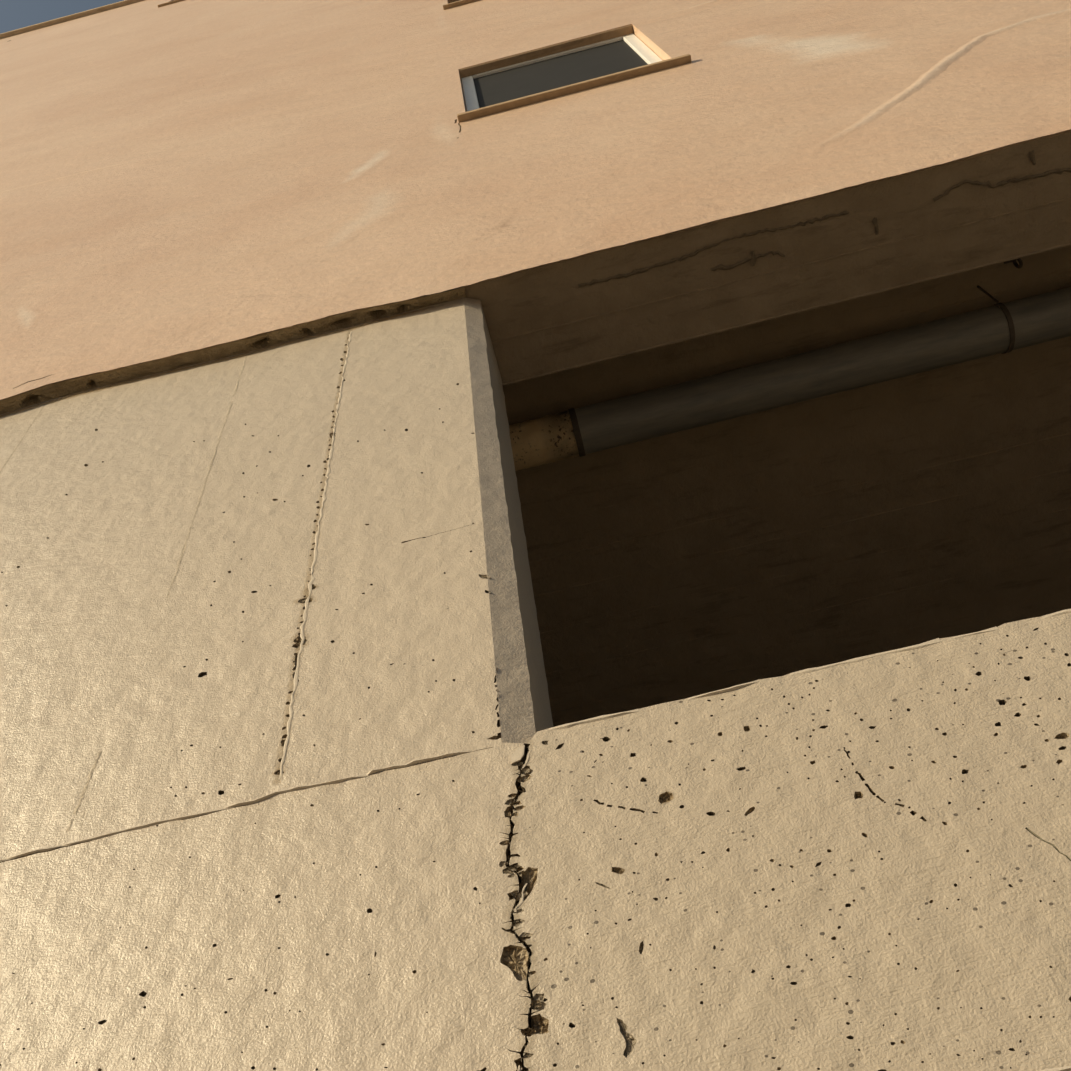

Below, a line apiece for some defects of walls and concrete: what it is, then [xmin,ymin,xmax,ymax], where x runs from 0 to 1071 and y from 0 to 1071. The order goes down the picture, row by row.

crack [933,150,1071,202]
crack [578,211,879,288]
crack [593,799,658,814]
crack [844,749,925,821]
crack [1025,827,1071,861]
crack [0,671,549,1071]
crack [1041,1063,1071,1071]